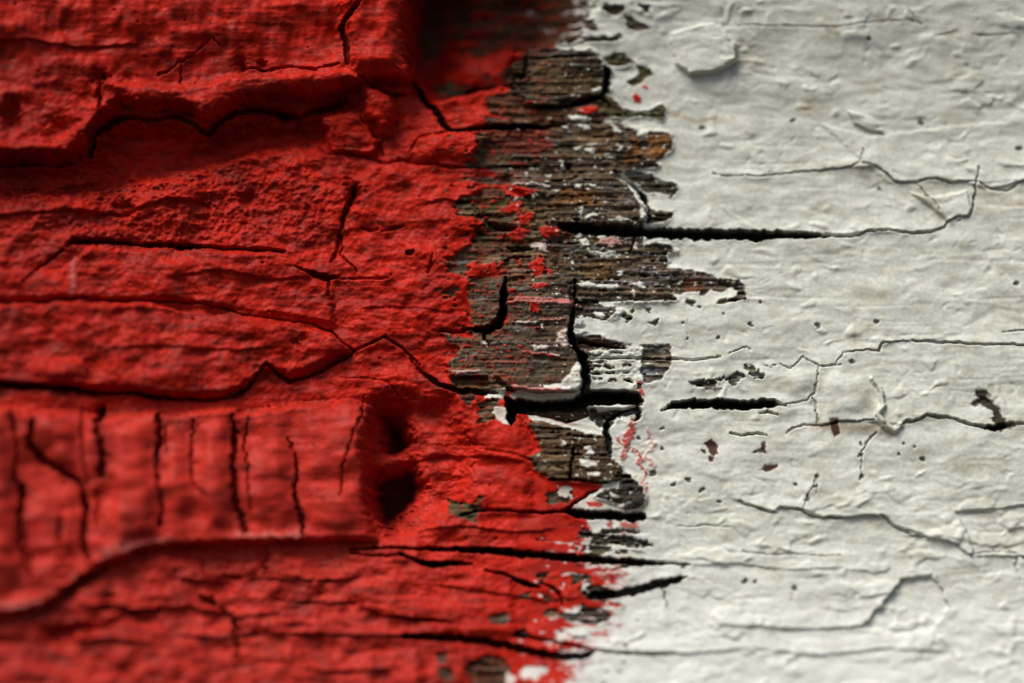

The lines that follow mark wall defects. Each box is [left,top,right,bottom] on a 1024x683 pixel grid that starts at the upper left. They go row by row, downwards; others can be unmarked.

crack [0,0,625,171]
peeling [418,0,747,424]
crack [557,147,1024,254]
peeling [448,495,483,525]
crack [0,183,1024,674]
peeling [525,407,646,512]
peeling [690,365,769,392]
peeling [436,652,512,683]
peeling [488,613,529,637]
peeling [519,529,653,639]